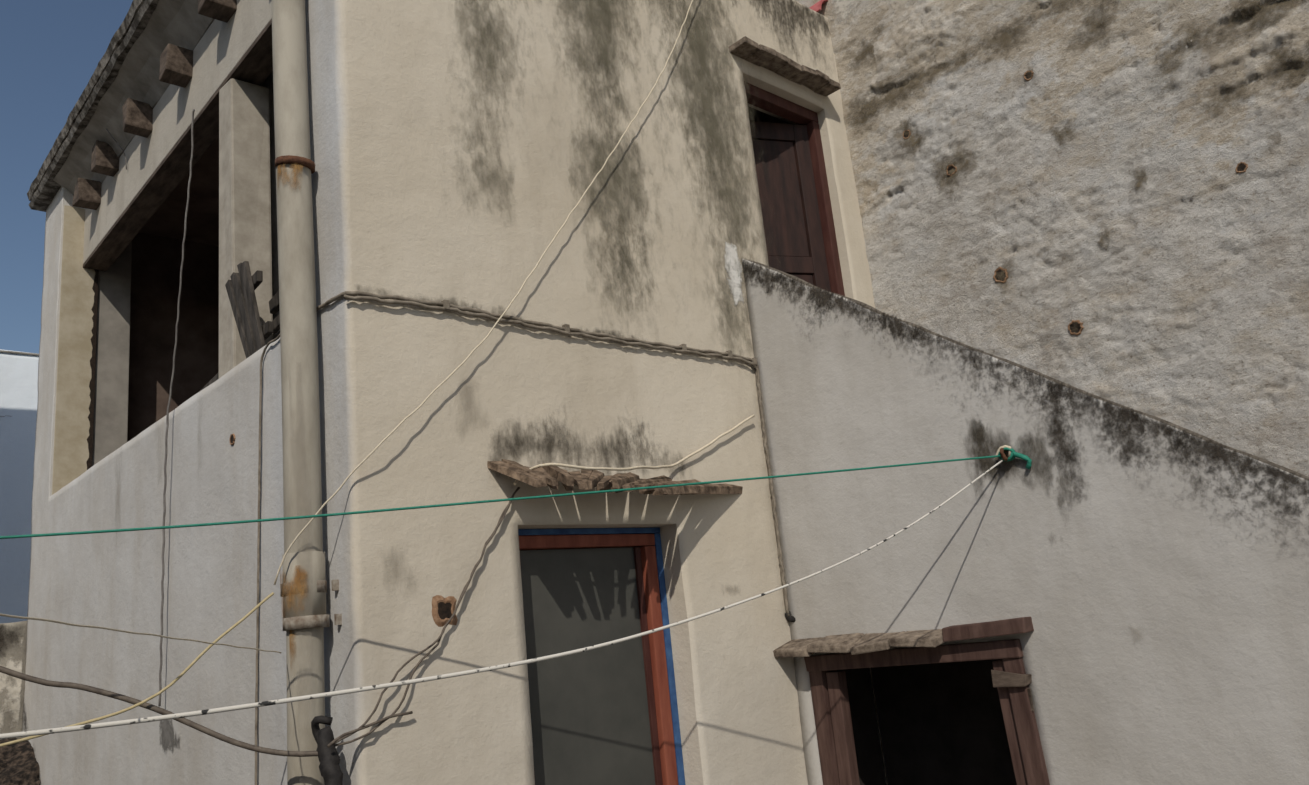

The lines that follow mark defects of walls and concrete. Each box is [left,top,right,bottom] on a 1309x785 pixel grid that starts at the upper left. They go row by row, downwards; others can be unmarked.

water stain [569,0,615,72]
water stain [759,0,828,48]
water stain [669,3,747,239]
water stain [590,141,640,222]
mould [743,263,1306,514]
mould [496,426,581,462]
mould [601,436,630,467]